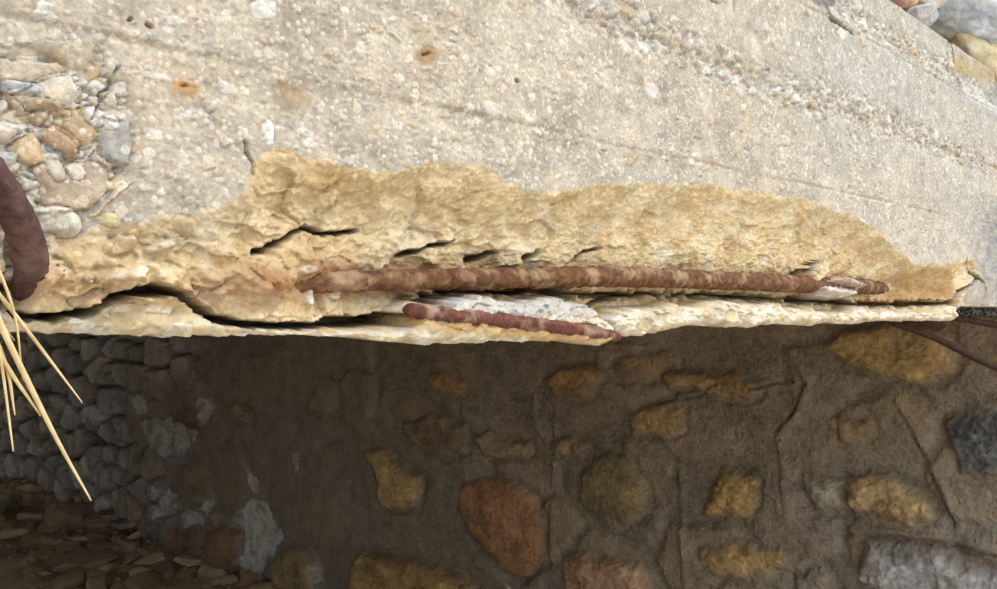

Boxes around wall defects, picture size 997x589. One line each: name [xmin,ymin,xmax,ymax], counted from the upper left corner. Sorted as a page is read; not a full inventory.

corrosion [174,80,197,93]
crack [250,225,359,255]
corrosion [315,264,351,276]
crack [394,242,538,263]
spalling [0,146,997,372]
crack [571,248,603,262]
corrosion [240,271,292,294]
corrosion [365,315,612,344]